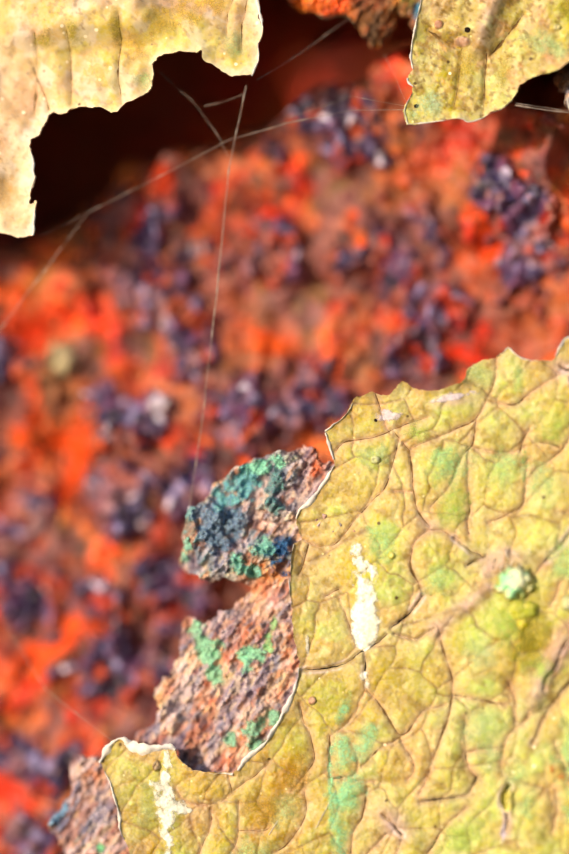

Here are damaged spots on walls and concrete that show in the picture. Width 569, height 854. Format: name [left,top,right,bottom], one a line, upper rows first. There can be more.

peeling [403,0,569,125]
peeling [0,0,263,238]
corrosion [140,161,176,200]
peeling [36,339,86,422]
corrosion [238,321,289,359]
corrosion [14,395,111,502]
corrosion [6,615,98,681]
peeling [98,336,569,854]
damp [350,543,381,651]
crack [274,365,569,854]
damp [149,751,192,854]
crack [177,764,268,851]